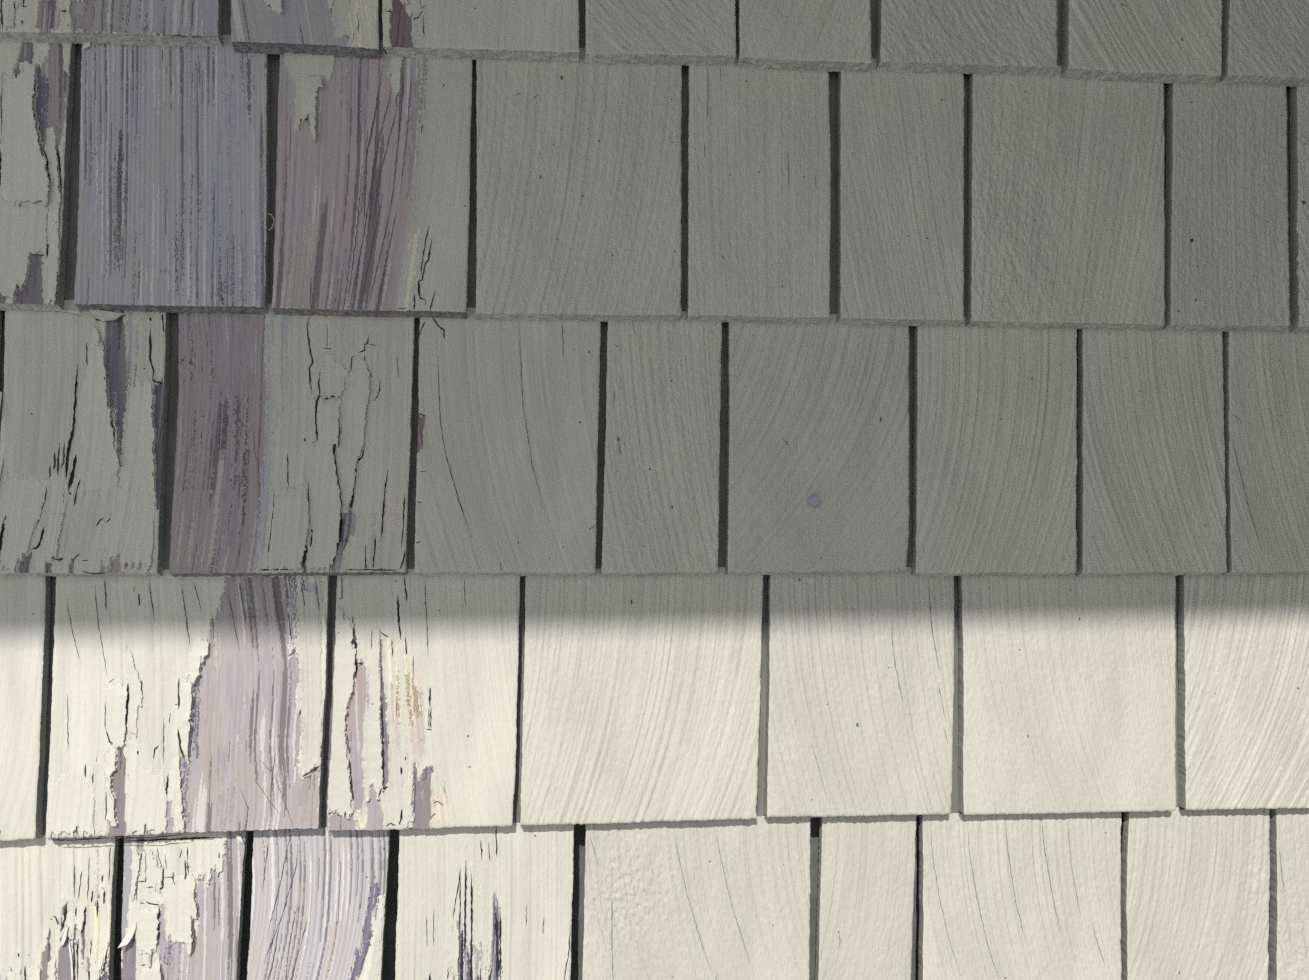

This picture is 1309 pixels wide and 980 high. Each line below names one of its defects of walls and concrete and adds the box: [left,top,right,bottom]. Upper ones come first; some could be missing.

peeling [0,0,433,980]
peeling [438,912,470,980]
peeling [490,892,500,980]